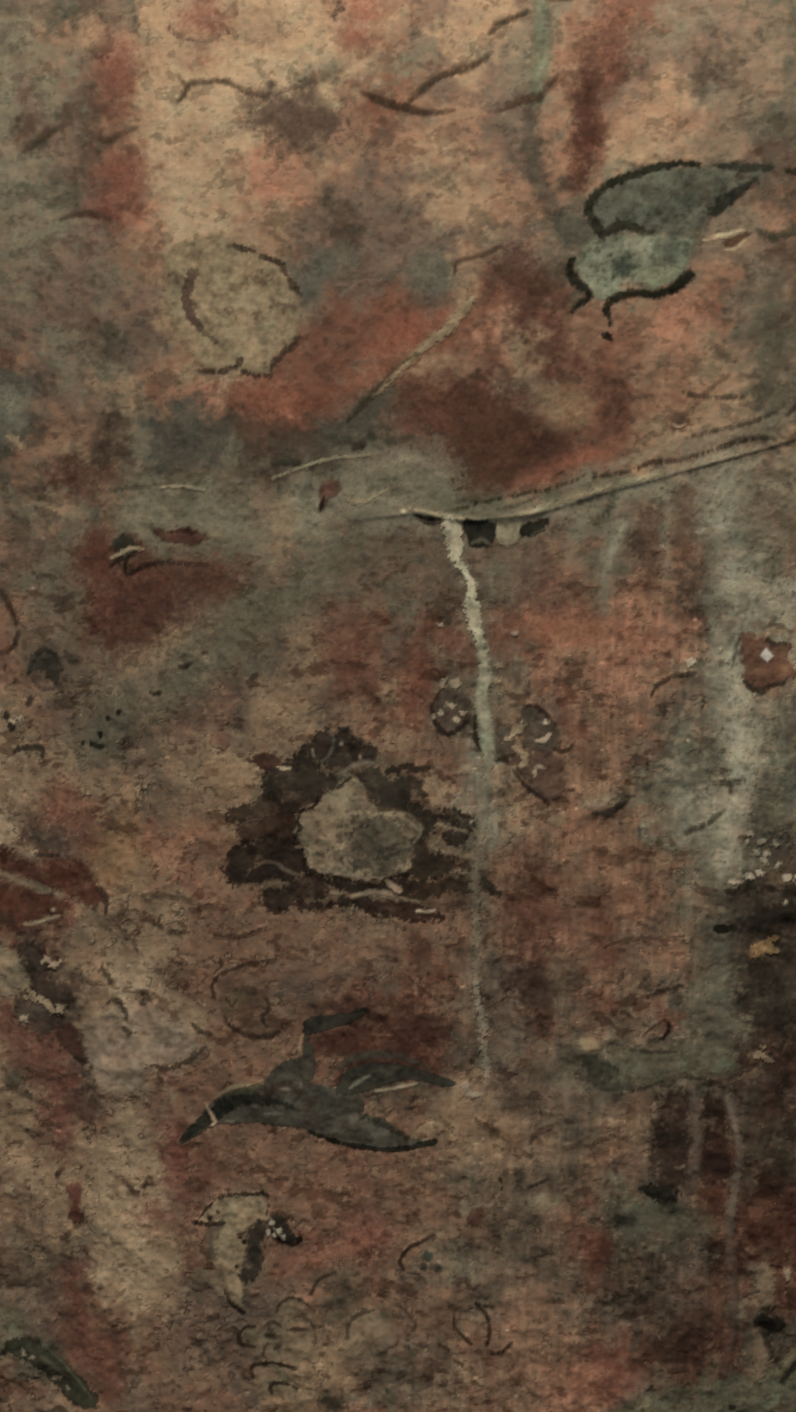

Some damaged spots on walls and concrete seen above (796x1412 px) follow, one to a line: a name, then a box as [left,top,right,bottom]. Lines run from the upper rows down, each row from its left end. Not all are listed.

spalling [415,514,442,524]
spalling [462,519,496,547]
spalling [520,518,549,536]
water stain [441,516,495,1109]